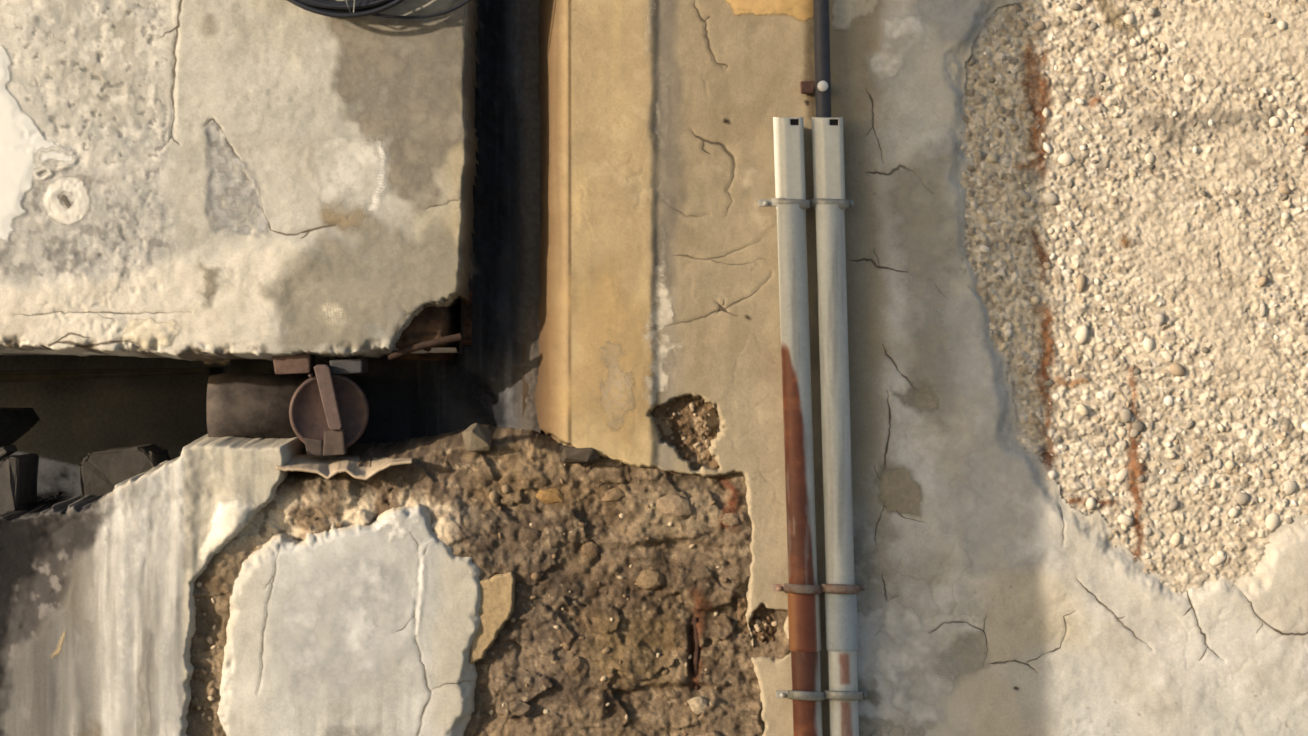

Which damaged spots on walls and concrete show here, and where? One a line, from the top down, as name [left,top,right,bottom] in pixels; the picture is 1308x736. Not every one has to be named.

crack [160,0,335,239]
crack [691,122,735,214]
rust [1020,44,1049,170]
crack [664,245,772,327]
spalling [959,0,1308,597]
rust [1038,308,1087,469]
spalling [185,266,791,736]
rust [1127,369,1144,562]
crack [394,601,465,736]
rust [689,590,711,687]
crack [1184,592,1223,660]
crack [1242,593,1308,635]